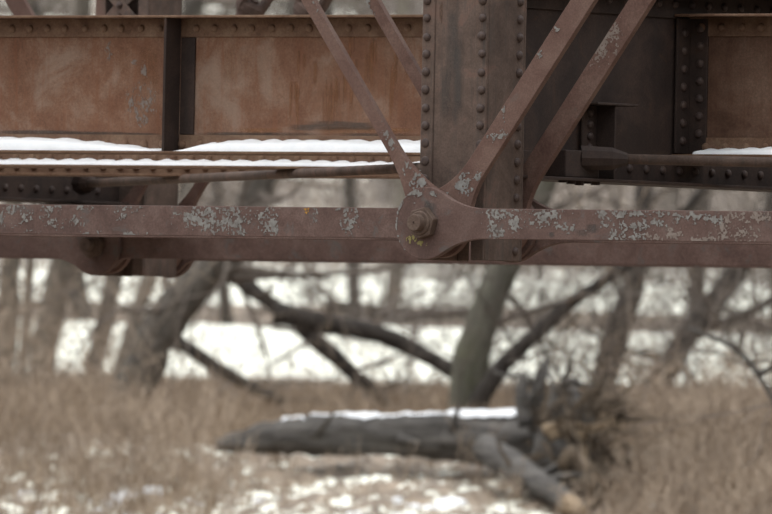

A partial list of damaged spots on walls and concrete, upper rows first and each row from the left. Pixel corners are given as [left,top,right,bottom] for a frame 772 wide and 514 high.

peeling [590,17,621,68]
peeling [0,205,101,234]
peeling [171,206,281,236]
peeling [481,209,575,239]
peeling [595,210,772,242]